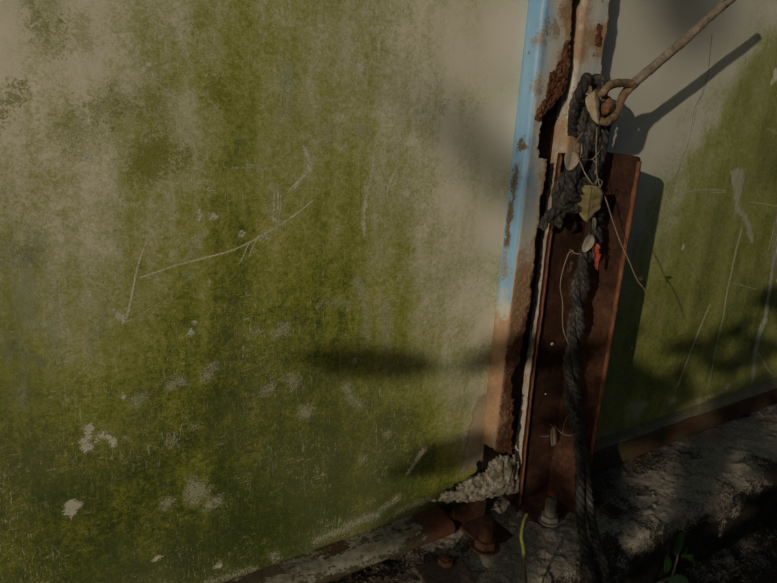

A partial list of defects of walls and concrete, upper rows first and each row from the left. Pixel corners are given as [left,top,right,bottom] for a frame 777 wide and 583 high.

rust [528,4,571,122]
rust [592,23,603,59]
rust [501,135,531,280]
damp [711,167,754,372]
damp [750,216,777,384]
damp [459,395,486,473]
peeling [204,562,257,583]
damp [475,521,584,583]
damp [627,470,777,583]